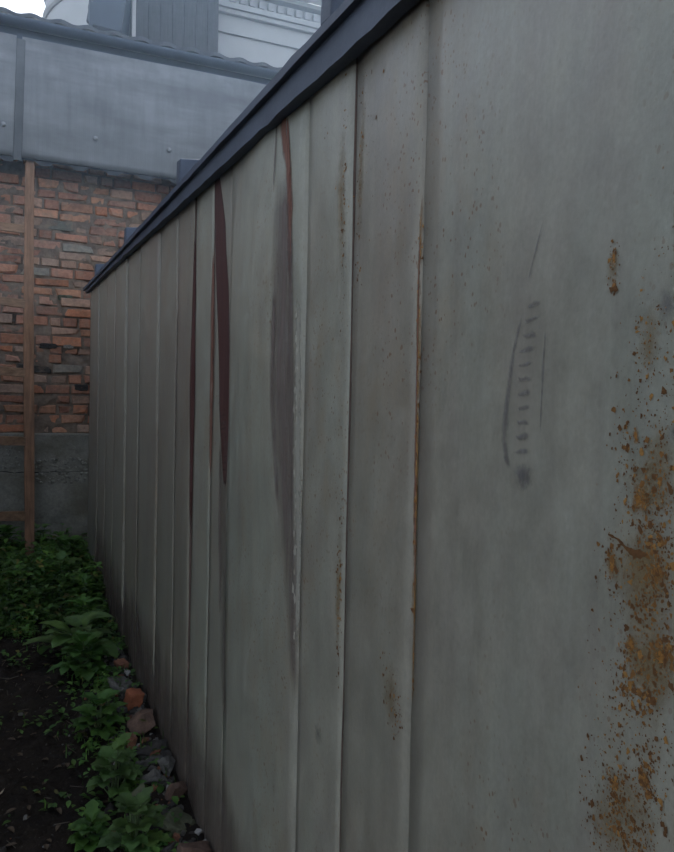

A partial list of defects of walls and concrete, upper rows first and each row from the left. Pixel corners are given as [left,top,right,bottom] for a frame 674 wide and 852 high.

damp [270,196,292,552]
rust [413,215,424,554]
rust [606,239,620,296]
rust [579,299,674,852]